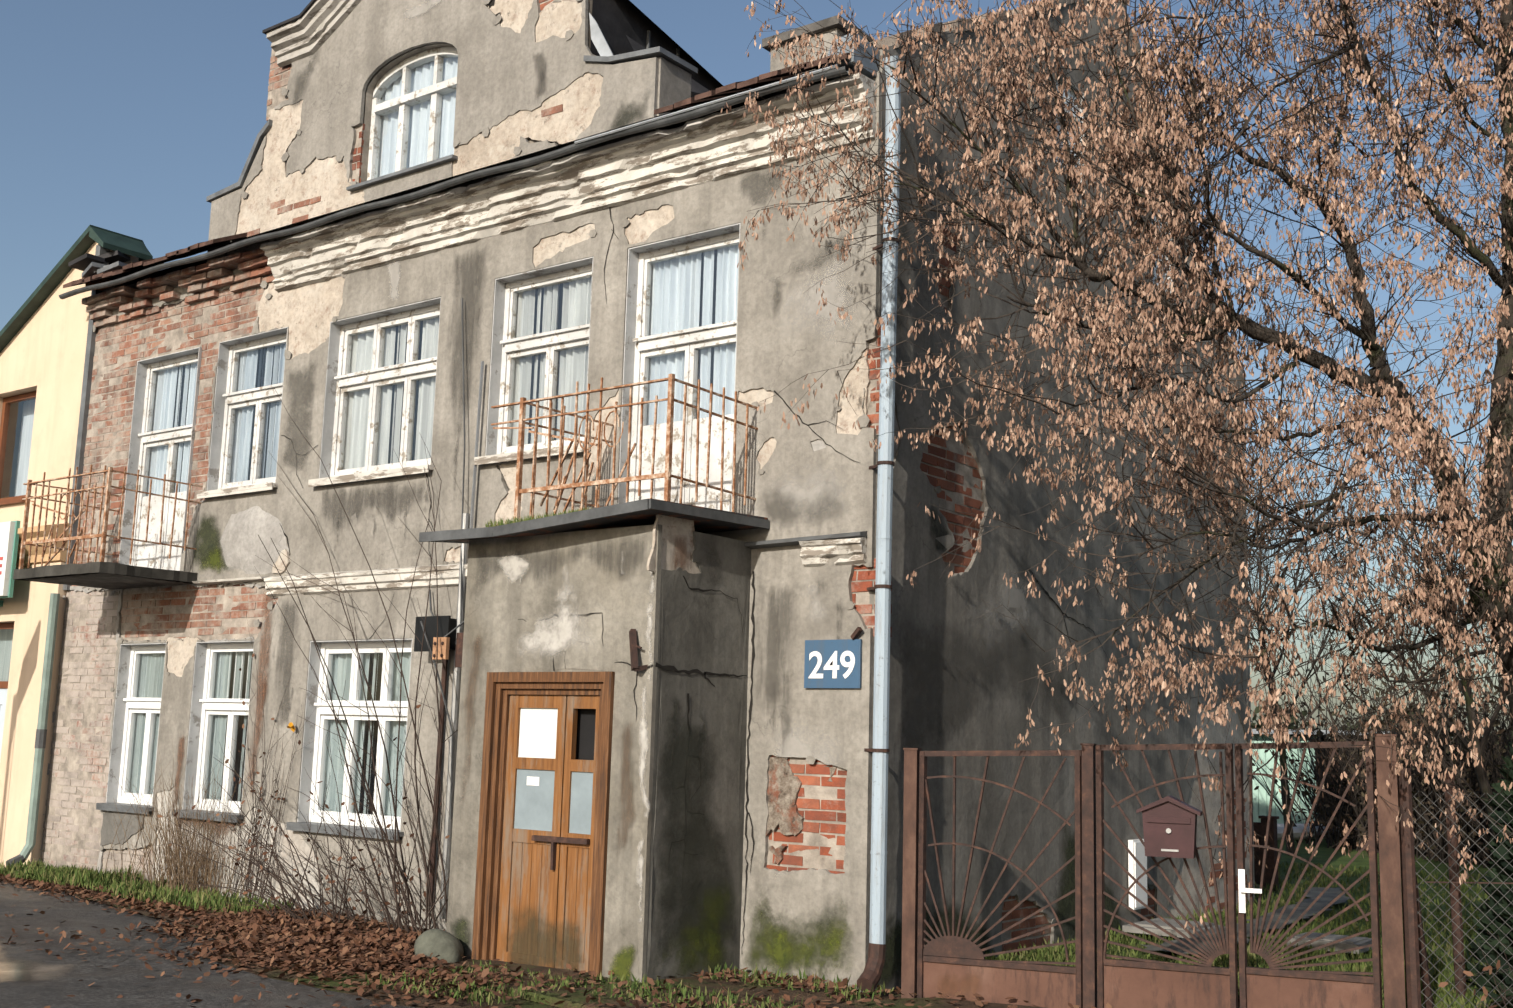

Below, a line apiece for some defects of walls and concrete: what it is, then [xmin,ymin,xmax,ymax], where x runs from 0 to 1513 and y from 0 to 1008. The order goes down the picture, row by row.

peeling [482,0,589,42]
peeling [227,49,365,256]
peeling [453,72,603,181]
peeling [619,205,674,244]
flaking render [74,273,348,564]
crack [774,390,860,463]
spalling [811,326,899,461]
flaking render [920,415,985,576]
flaking render [39,582,324,910]
crack [518,571,755,952]
water stain [660,702,733,949]
flaking render [766,755,847,874]